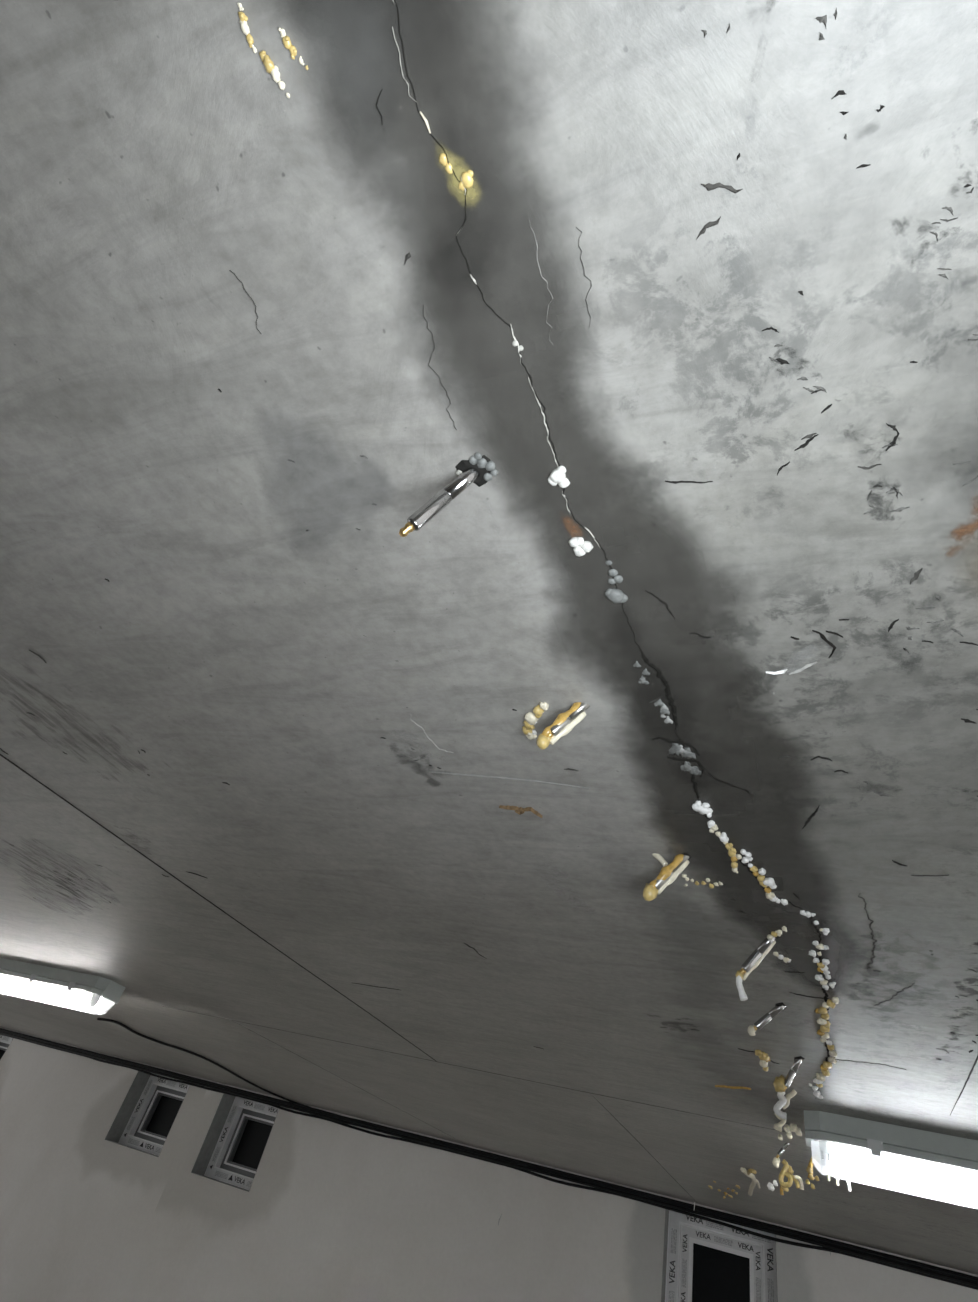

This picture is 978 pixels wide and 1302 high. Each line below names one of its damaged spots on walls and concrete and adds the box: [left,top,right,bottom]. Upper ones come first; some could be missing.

leakage [237,3,290,98]
leakage [278,27,308,70]
crack [376,0,753,832]
leakage [301,0,853,1141]
rust [949,508,978,554]
crack [738,859,906,1099]